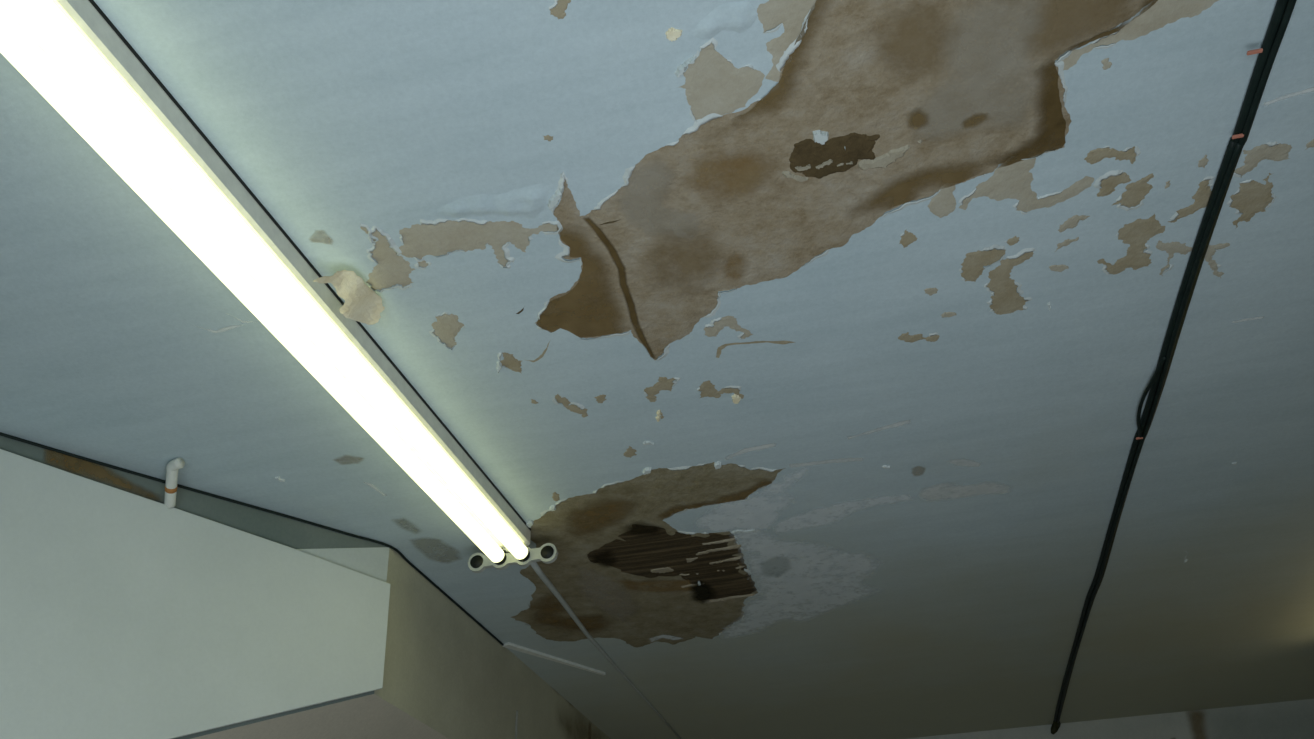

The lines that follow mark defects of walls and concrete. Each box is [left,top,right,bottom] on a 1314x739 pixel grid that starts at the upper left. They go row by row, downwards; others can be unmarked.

peeling [313,0,1230,361]
peeling [1227,139,1314,228]
peeling [496,352,522,373]
peeling [531,394,607,418]
peeling [644,377,681,422]
peeling [697,380,744,404]
peeling [511,441,785,648]
water stain [699,458,1010,638]